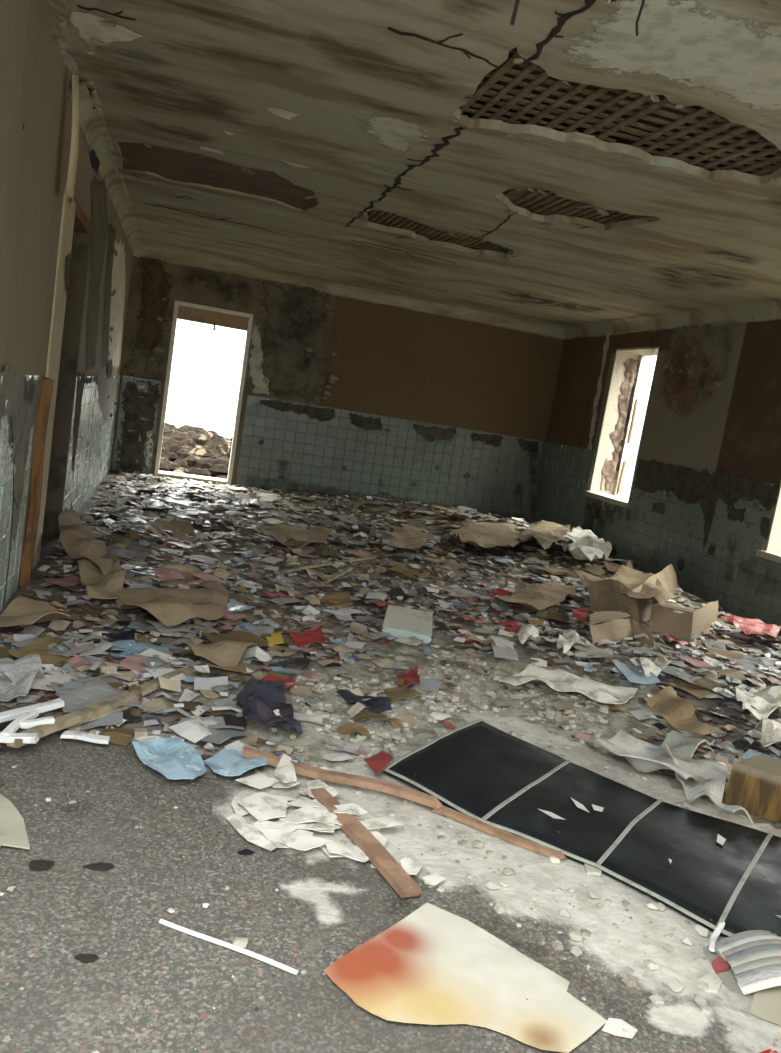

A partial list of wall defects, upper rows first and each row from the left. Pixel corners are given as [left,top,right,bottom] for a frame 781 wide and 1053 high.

peeling [69,11,167,57]
crack [388,26,498,68]
crack [523,0,617,65]
peeling [448,0,781,183]
peeling [361,112,431,154]
spalling [110,141,321,210]
crack [345,127,467,263]
spalling [358,210,517,262]
crack [474,215,511,241]
spalling [502,187,660,234]
peeling [72,149,171,477]
peeling [0,364,44,541]